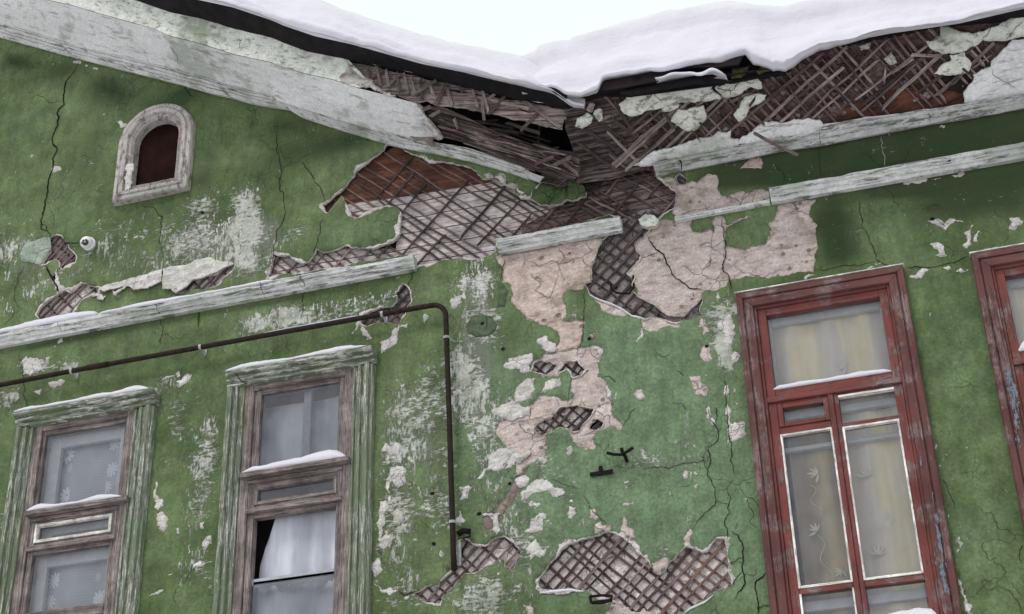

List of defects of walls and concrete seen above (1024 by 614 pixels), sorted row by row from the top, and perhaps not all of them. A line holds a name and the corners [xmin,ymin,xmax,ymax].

crack [29,65,78,238]
peeling [903,172,965,185]
spalling [20,234,126,319]
spalling [179,254,236,294]
crack [644,235,703,290]
crack [721,217,732,289]
crack [814,204,970,272]
peeling [930,242,969,273]
peeling [930,218,997,249]
peeling [1009,217,1023,230]
spalling [264,103,818,614]
crack [644,379,769,612]